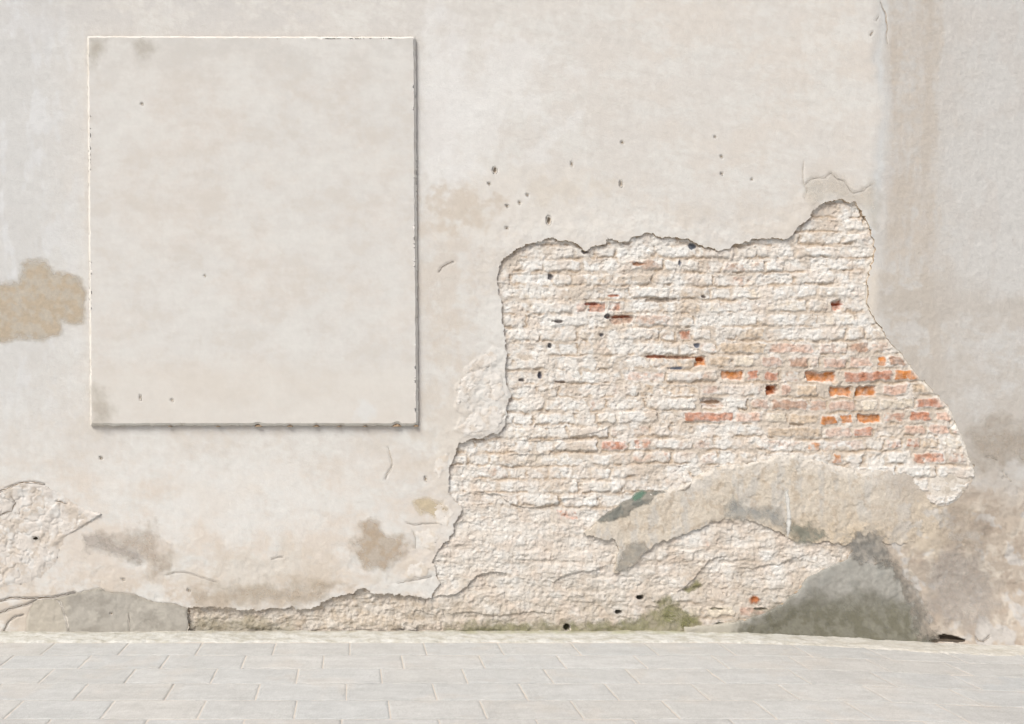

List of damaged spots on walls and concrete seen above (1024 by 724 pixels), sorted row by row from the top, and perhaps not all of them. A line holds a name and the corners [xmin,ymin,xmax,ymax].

crack [802,163,873,198]
water stain [0,262,84,342]
flaking render [188,199,975,631]
water stain [358,520,401,569]
water stain [739,561,938,642]